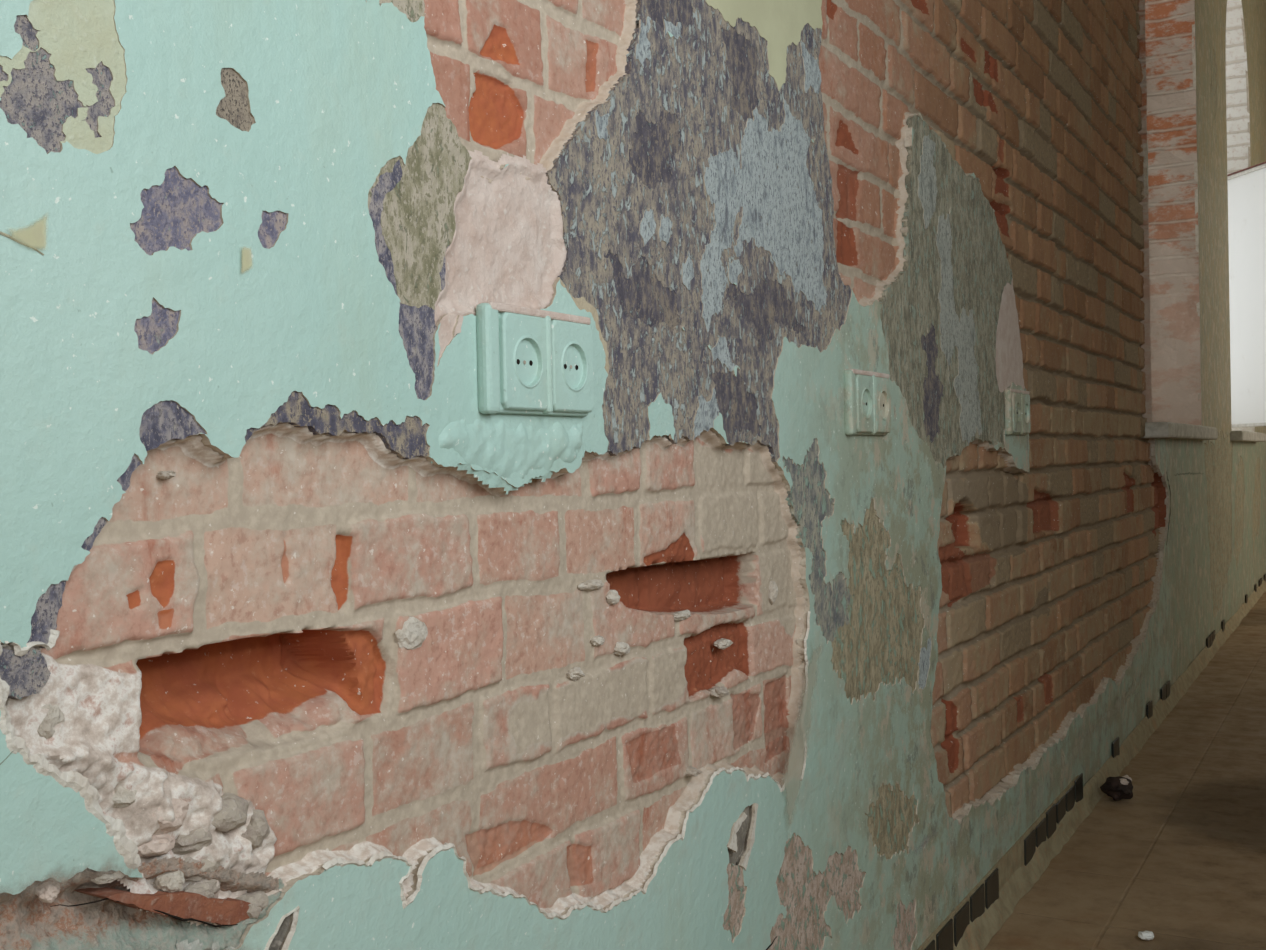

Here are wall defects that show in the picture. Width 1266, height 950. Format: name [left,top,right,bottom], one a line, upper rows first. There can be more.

peeling [0,0,127,154]
peeling [216,68,254,131]
peeling [130,167,223,255]
peeling [258,211,287,249]
peeling [134,299,179,354]
spalling [368,0,1167,819]
spalling [0,391,931,942]